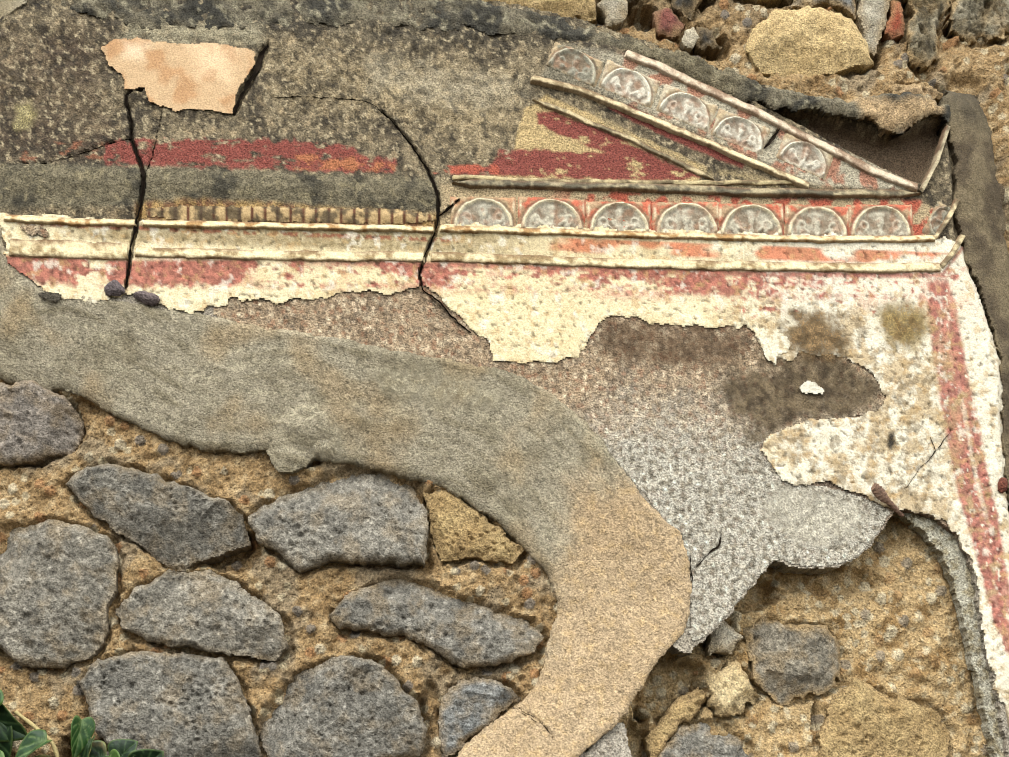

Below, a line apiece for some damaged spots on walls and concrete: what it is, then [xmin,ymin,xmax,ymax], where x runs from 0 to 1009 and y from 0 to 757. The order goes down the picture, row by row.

crack [233,44,269,115]
crack [10,89,161,289]
crack [275,95,471,333]
damp [724,309,878,441]
damp [883,303,925,343]
spalling [213,286,1005,757]
spalling [998,477,1008,494]